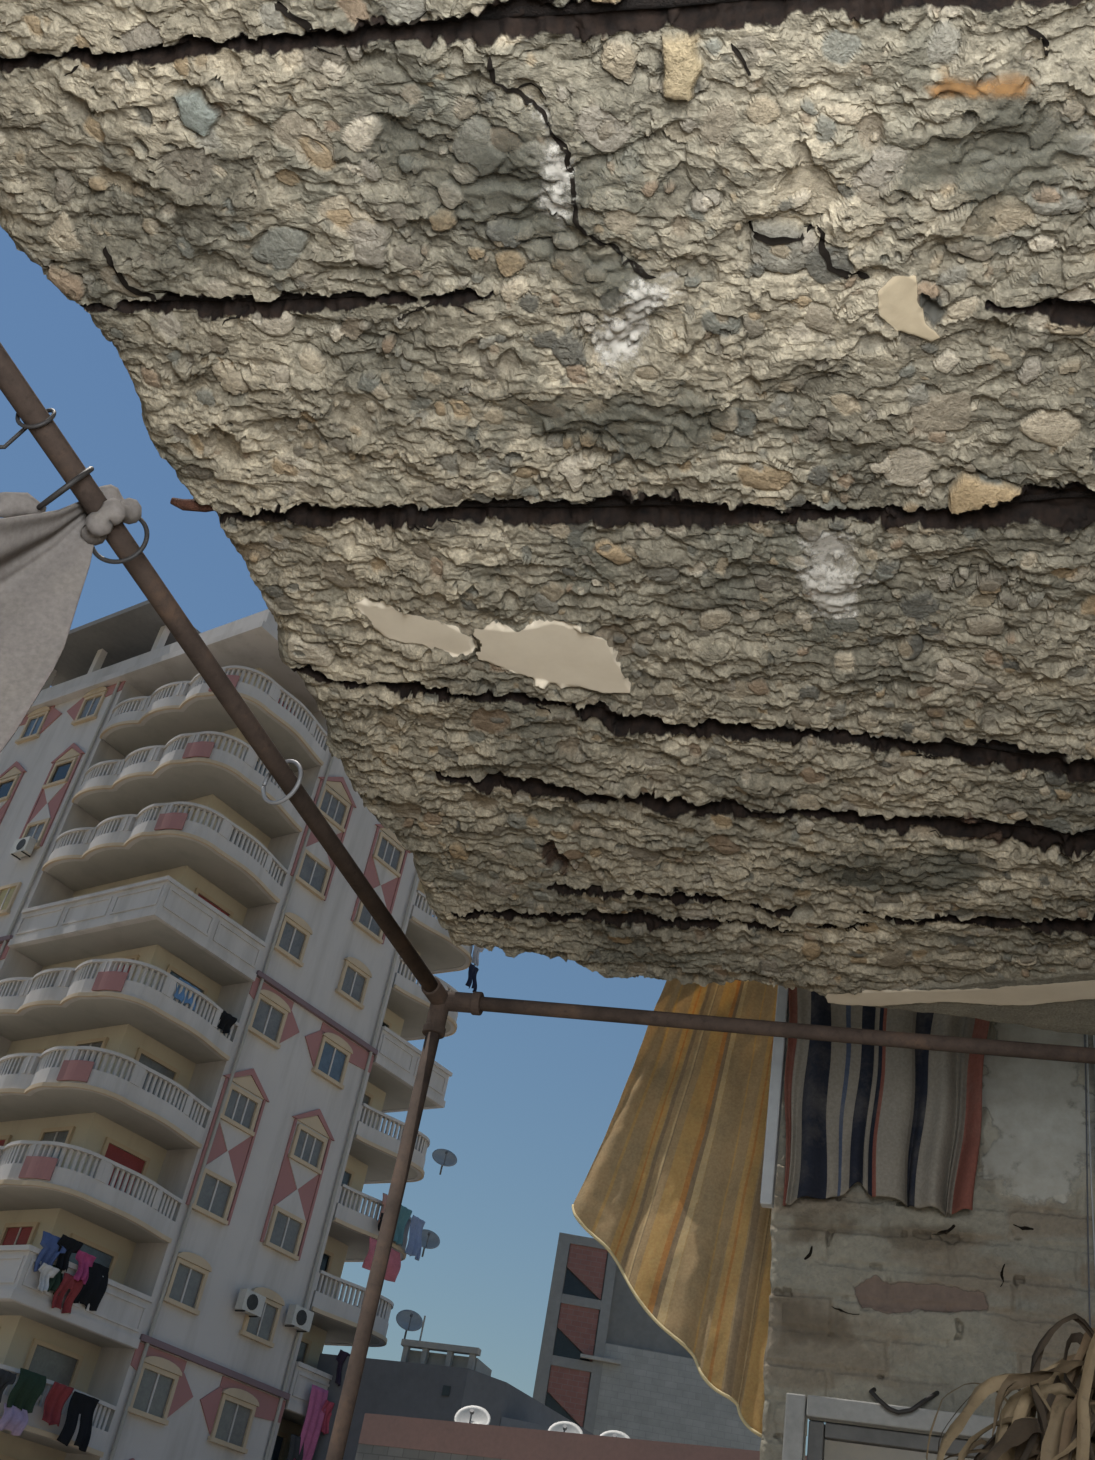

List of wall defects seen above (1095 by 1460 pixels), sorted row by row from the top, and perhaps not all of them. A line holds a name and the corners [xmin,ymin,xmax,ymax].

rust [931,77,1030,97]
crack [0,0,1083,279]
crack [72,246,493,325]
spalling [878,275,940,342]
crack [985,298,1095,328]
crack [170,481,1095,534]
water stain [796,531,870,619]
crack [278,648,1095,783]
spalling [854,1275,988,1314]